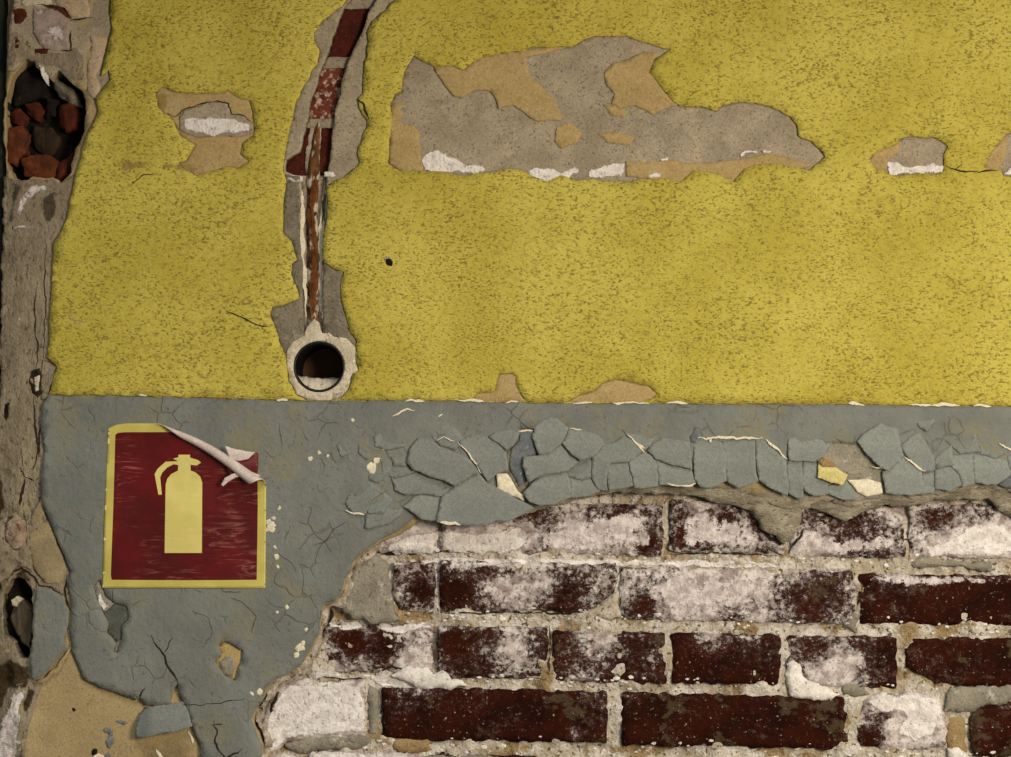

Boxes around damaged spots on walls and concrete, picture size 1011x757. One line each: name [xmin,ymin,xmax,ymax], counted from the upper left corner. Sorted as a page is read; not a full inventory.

peeling [156,87,254,176]
peeling [388,36,825,182]
peeling [870,137,948,176]
crack [946,165,999,173]
flaking render [0,0,112,757]
leakage [388,509,780,614]
flaking render [250,414,1011,757]
leakage [875,573,999,586]
leakage [925,524,1011,557]
crack [151,636,243,757]
leakage [267,671,417,751]
leakage [869,692,942,742]